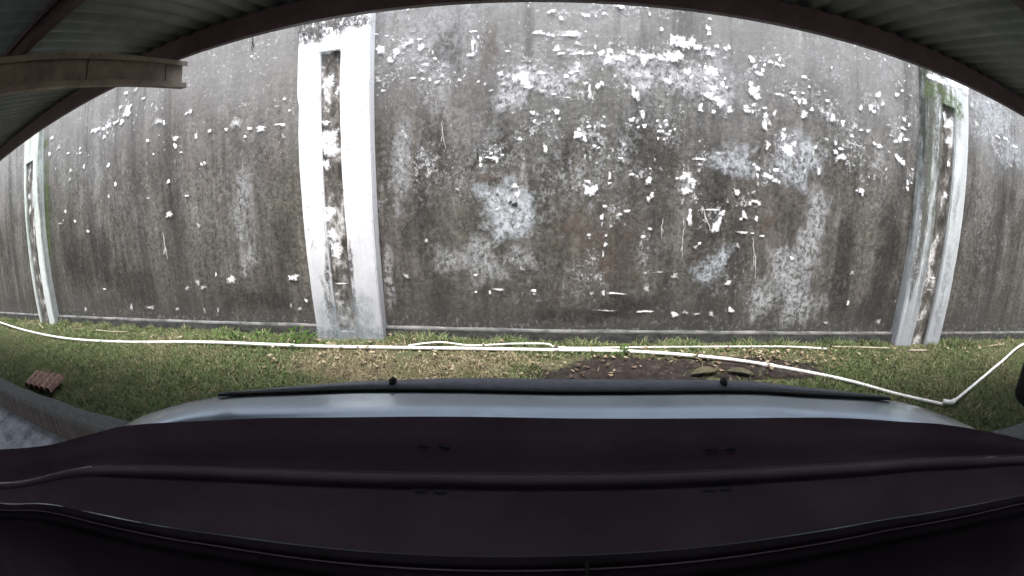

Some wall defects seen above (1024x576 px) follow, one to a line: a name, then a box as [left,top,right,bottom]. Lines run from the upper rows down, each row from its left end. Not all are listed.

peeling [91,87,145,139]
peeling [224,120,285,138]
peeling [321,74,338,95]
peeling [322,120,341,170]
water stain [495,54,734,112]
peeling [476,3,915,299]
water stain [714,147,754,175]
water stain [437,180,534,282]
water stain [750,134,852,324]
peeling [322,207,353,330]
water stain [384,248,394,307]
water stain [693,246,728,281]